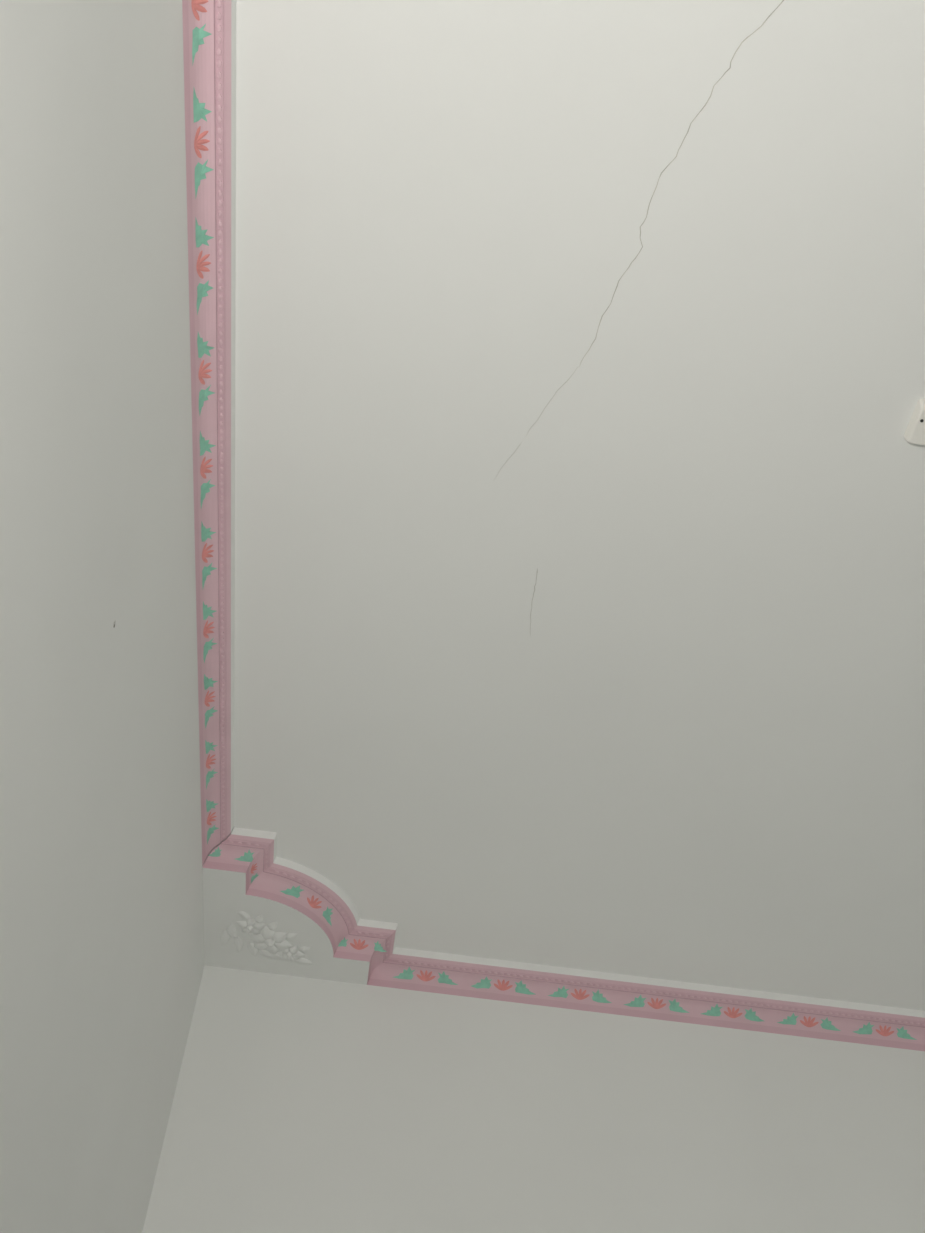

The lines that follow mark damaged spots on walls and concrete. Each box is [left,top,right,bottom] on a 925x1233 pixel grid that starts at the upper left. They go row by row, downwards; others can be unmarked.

crack [496,0,784,477]